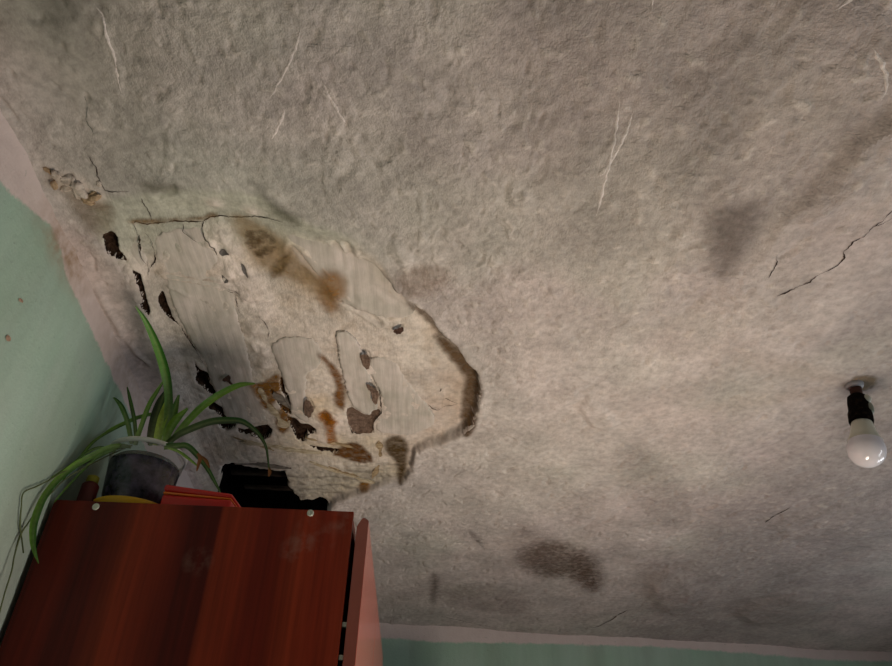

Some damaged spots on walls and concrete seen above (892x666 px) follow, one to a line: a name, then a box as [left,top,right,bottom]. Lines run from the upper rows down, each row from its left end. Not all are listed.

leakage [243,225,320,291]
crack [769,211,892,296]
flaking render [43,167,487,511]